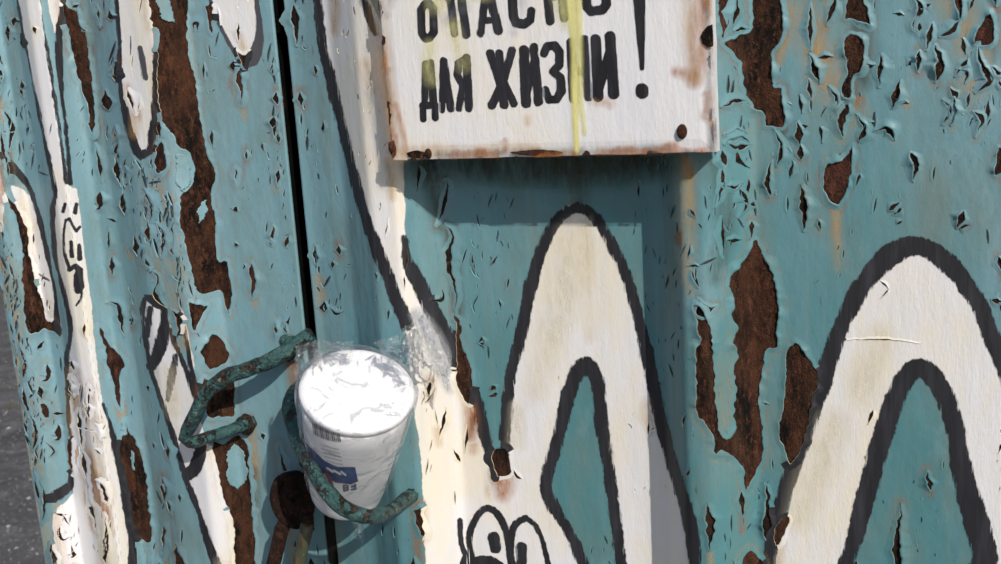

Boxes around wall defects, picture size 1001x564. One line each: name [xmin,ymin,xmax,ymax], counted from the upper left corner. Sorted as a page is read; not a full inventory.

peeling [715,0,794,132]
peeling [834,0,878,105]
peeling [949,0,1000,51]
peeling [0,119,62,358]
peeling [818,141,860,212]
peeling [986,143,1001,180]
peeling [685,236,824,493]
peeling [62,321,189,564]